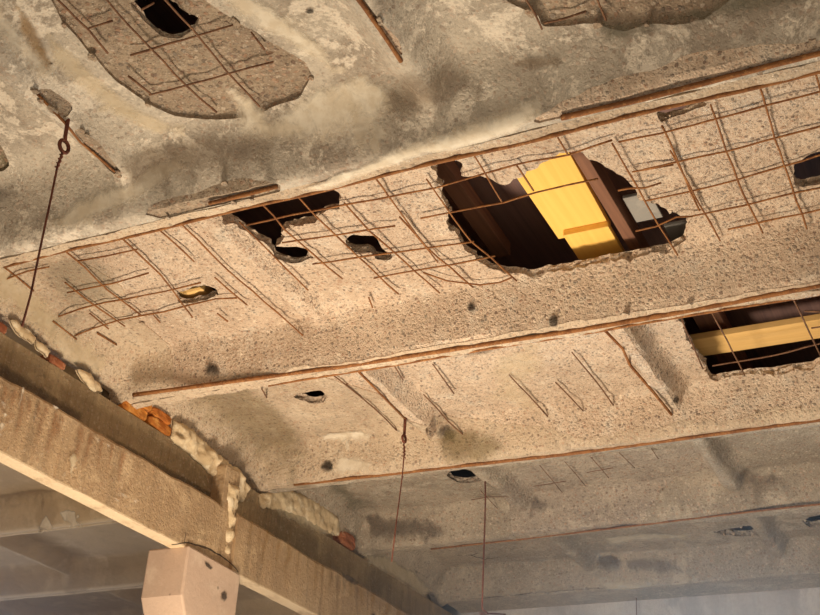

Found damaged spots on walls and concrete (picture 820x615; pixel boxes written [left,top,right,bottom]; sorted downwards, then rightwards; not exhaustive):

spalling [52,0,314,120]
corrosion [356,0,403,63]
spalling [507,0,729,31]
spalling [534,38,820,123]
spalling [0,145,9,172]
corrosion [3,51,820,268]
spalling [68,74,820,439]
corrosion [132,284,820,419]